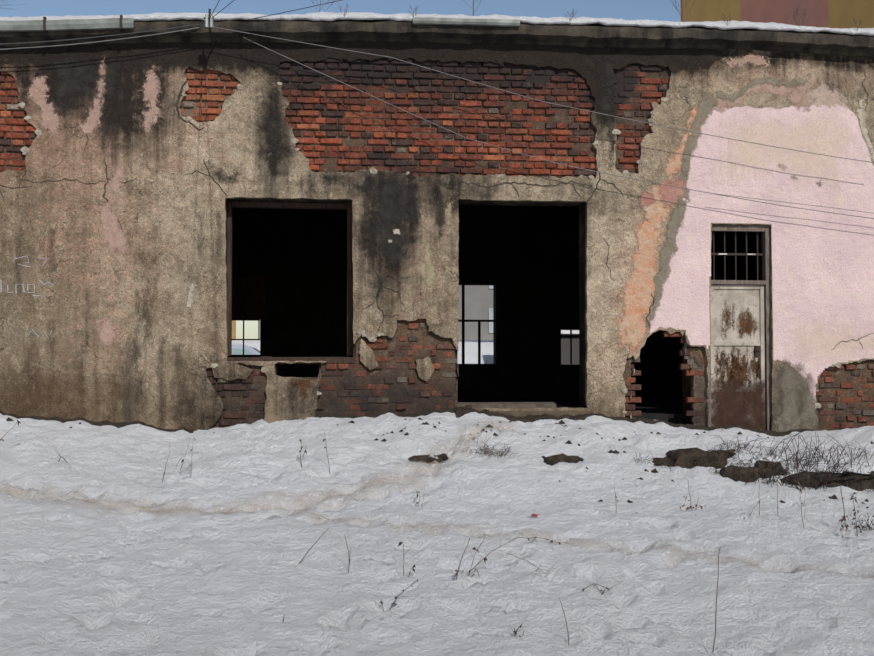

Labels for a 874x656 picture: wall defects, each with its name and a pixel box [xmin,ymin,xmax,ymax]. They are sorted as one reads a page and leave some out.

spalling [0,72,60,172]
water stain [45,51,122,119]
spalling [180,68,244,124]
spalling [277,58,598,179]
spalling [612,64,670,176]
peeling [726,53,770,69]
peeling [615,79,874,431]
rust [722,306,758,338]
spalling [206,356,271,430]
spalling [293,319,472,417]
rust [691,347,766,430]